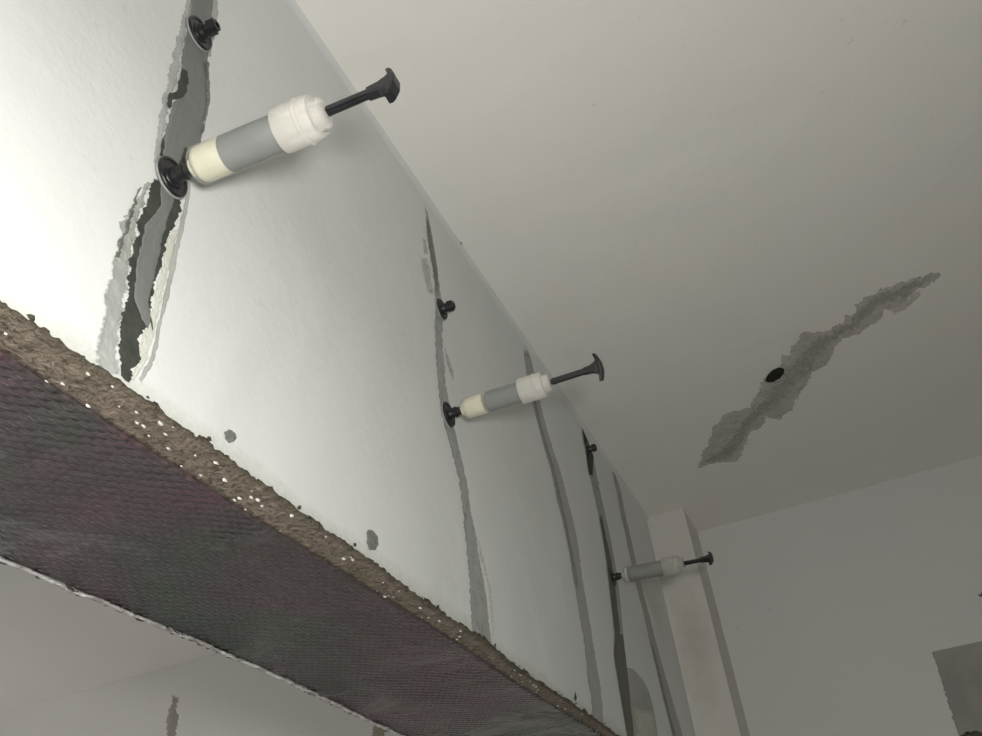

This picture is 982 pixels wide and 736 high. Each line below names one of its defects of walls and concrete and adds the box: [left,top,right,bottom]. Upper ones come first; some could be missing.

crack [97,0,218,382]
spalling [0,301,619,736]
crack [426,211,491,643]
crack [524,352,534,376]
crack [532,400,682,736]